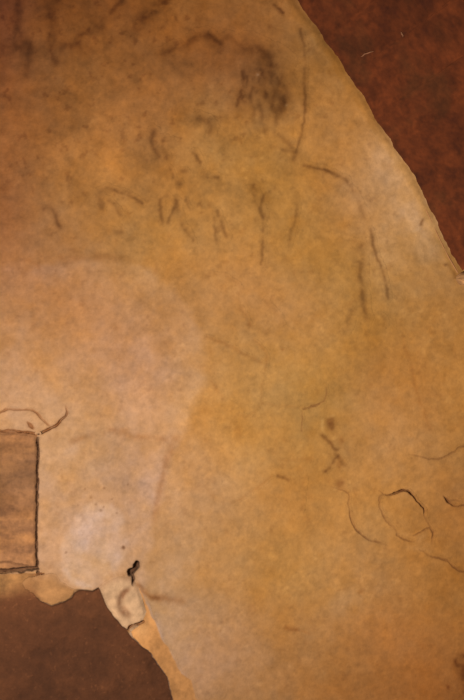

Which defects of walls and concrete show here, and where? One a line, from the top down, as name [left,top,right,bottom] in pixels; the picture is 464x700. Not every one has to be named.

peeling [0,257,212,700]
crack [410,444,464,462]
crack [329,484,464,575]